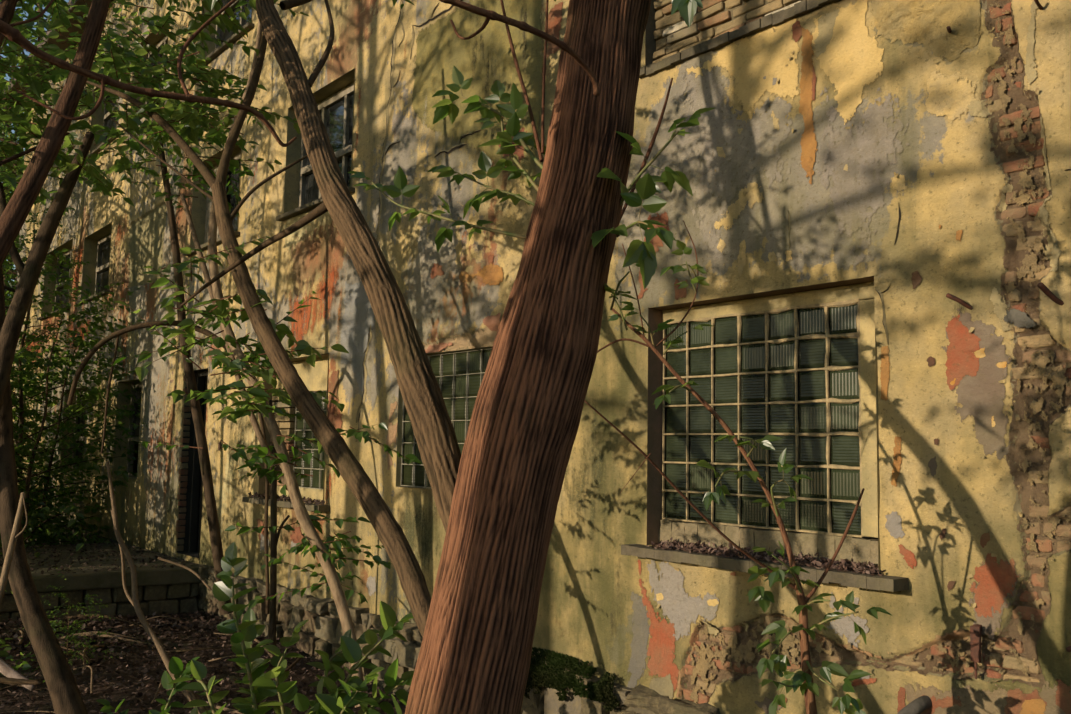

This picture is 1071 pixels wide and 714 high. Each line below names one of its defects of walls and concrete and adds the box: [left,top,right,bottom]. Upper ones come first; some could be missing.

peeling [547,2,563,58]
corrosion [792,21,817,184]
corrosion [289,266,341,358]
peeling [459,254,503,286]
flaking render [627,0,1071,714]